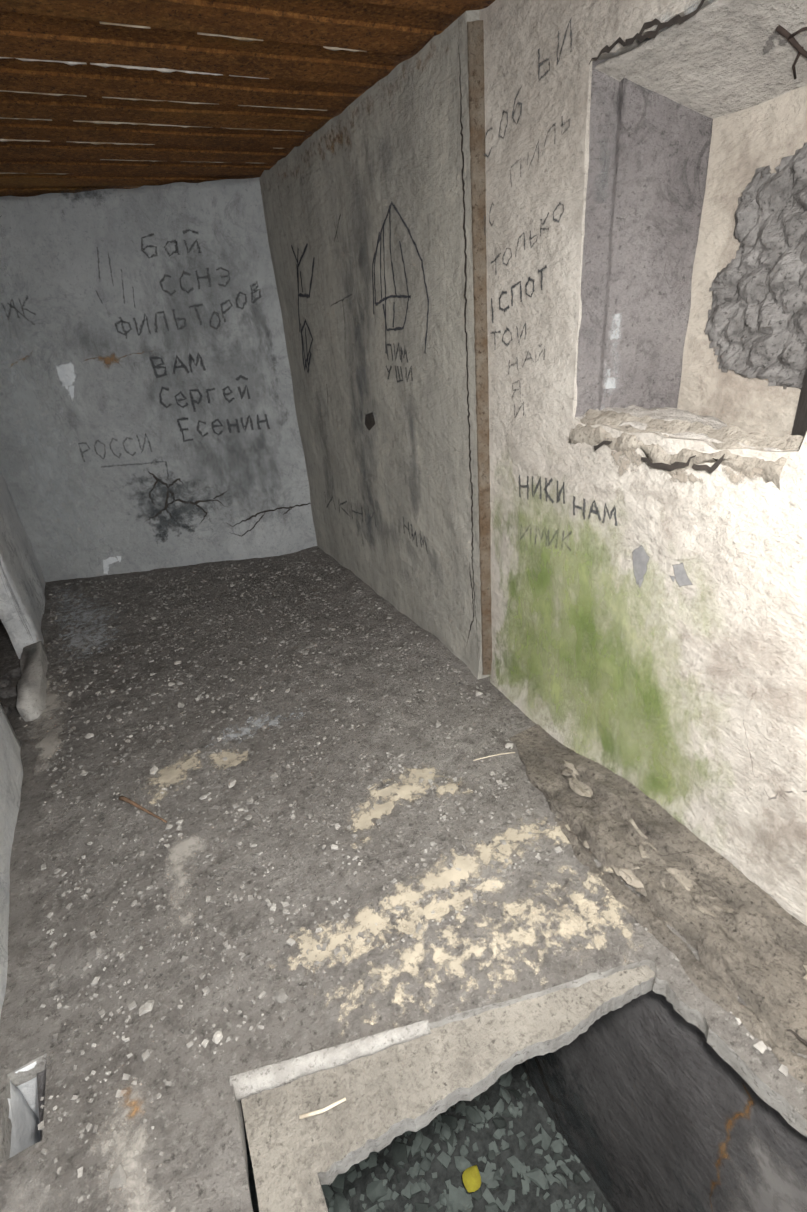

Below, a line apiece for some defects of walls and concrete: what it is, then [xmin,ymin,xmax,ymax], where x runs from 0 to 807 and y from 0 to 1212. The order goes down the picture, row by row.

spalling [589,0,705,64]
spalling [763,32,787,54]
spalling [568,409,804,490]
crack [148,471,311,537]